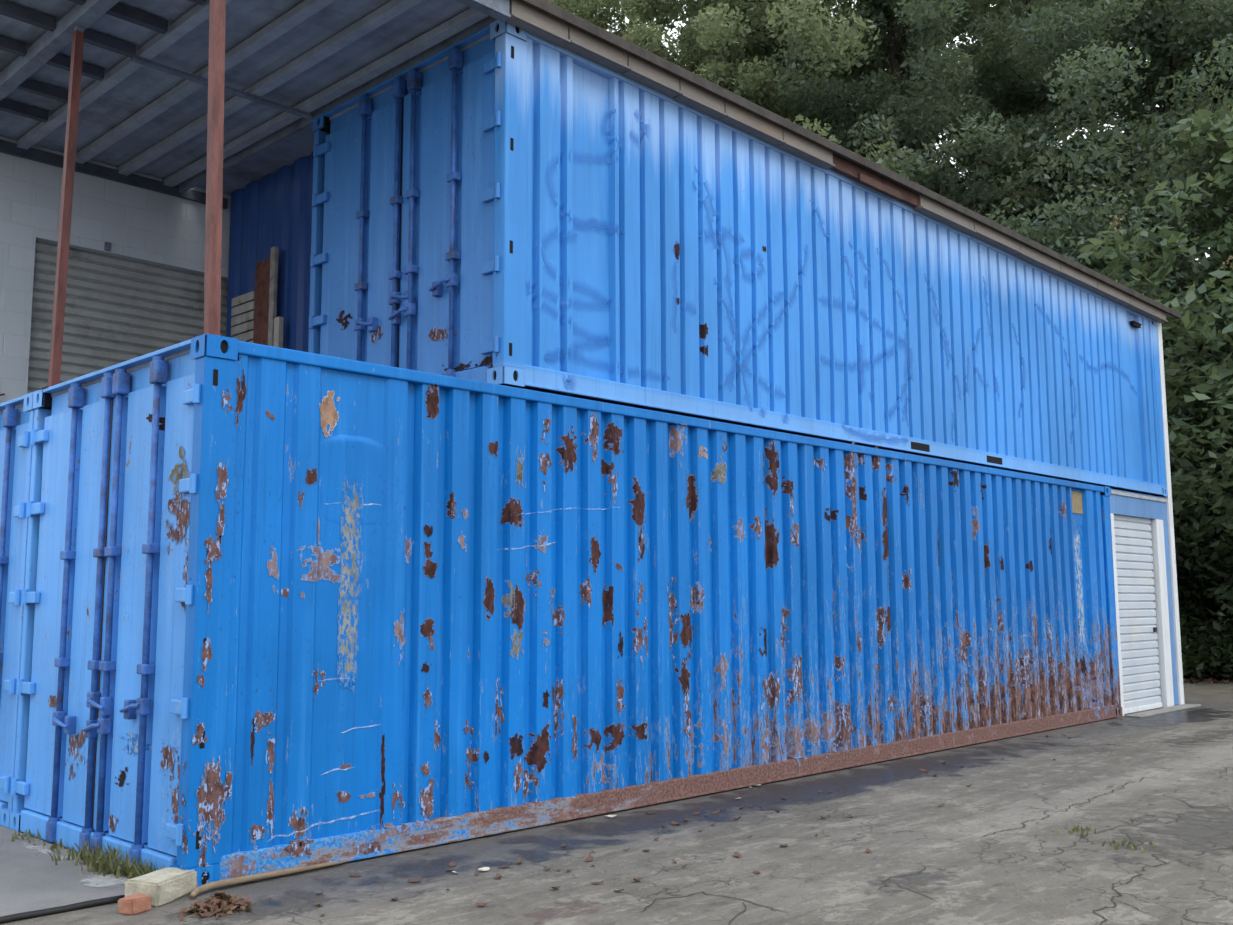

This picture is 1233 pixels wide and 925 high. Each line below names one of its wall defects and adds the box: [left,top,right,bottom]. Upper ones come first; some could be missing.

peeling [319,390,340,437]
rust [500,411,647,562]
rust [749,438,799,569]
peeling [297,478,362,694]
rust [580,534,648,662]
rust [160,739,233,881]
rust [248,710,314,858]
rust [379,616,441,827]
rust [463,668,648,807]
crack [641,891,789,925]
crack [872,867,935,900]
crack [984,776,1233,925]